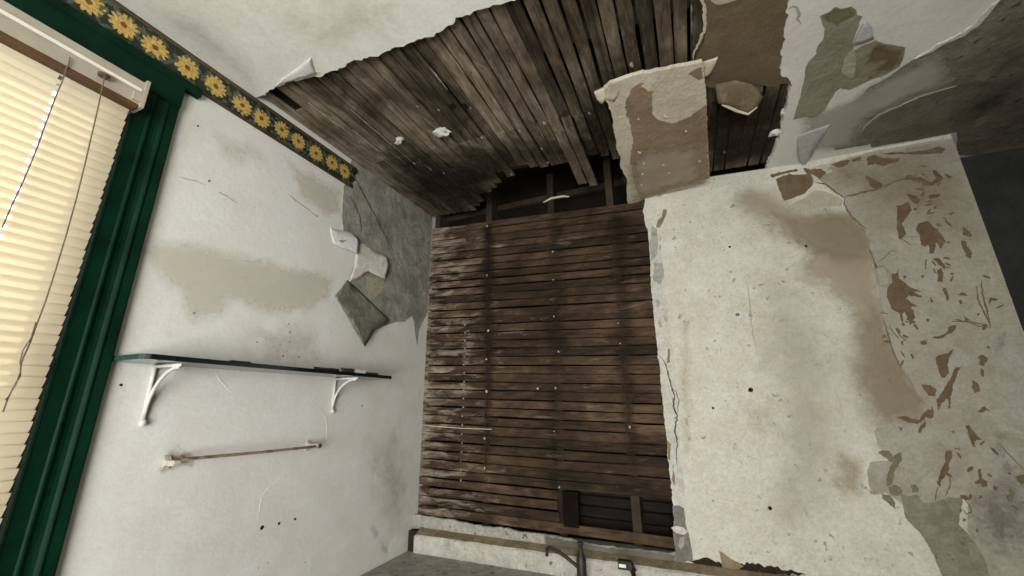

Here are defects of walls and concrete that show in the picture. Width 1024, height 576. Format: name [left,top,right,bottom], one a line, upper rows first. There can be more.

spalling [689,0,707,80]
damp [156,247,327,314]
peeling [342,160,432,343]
flaking render [414,209,693,562]
crack [657,354,679,467]
damp [743,195,920,414]
peeling [770,0,1024,576]